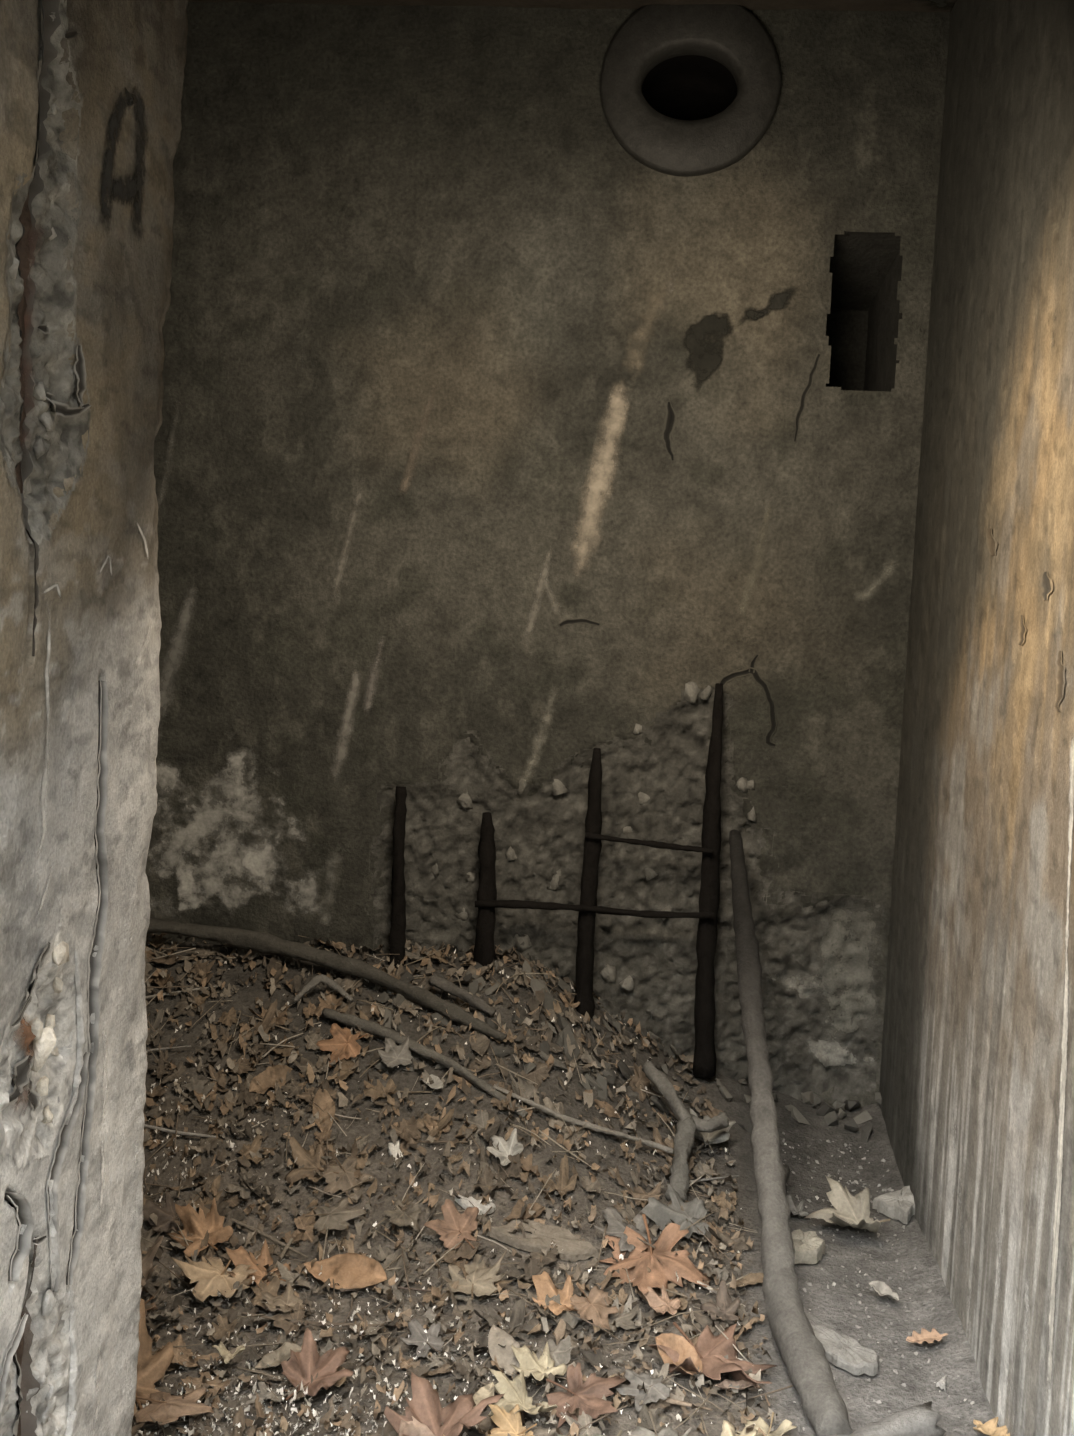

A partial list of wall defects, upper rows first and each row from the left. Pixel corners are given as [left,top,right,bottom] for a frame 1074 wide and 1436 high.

spalling [0,0,91,548]
flaking render [662,402,677,461]
flaking render [684,289,794,389]
flaking render [794,354,821,442]
water stain [160,589,194,716]
water stain [334,641,383,775]
water stain [147,751,338,924]
spalling [0,925,77,1170]
crack [4,681,109,1436]
spalling [0,1247,70,1436]